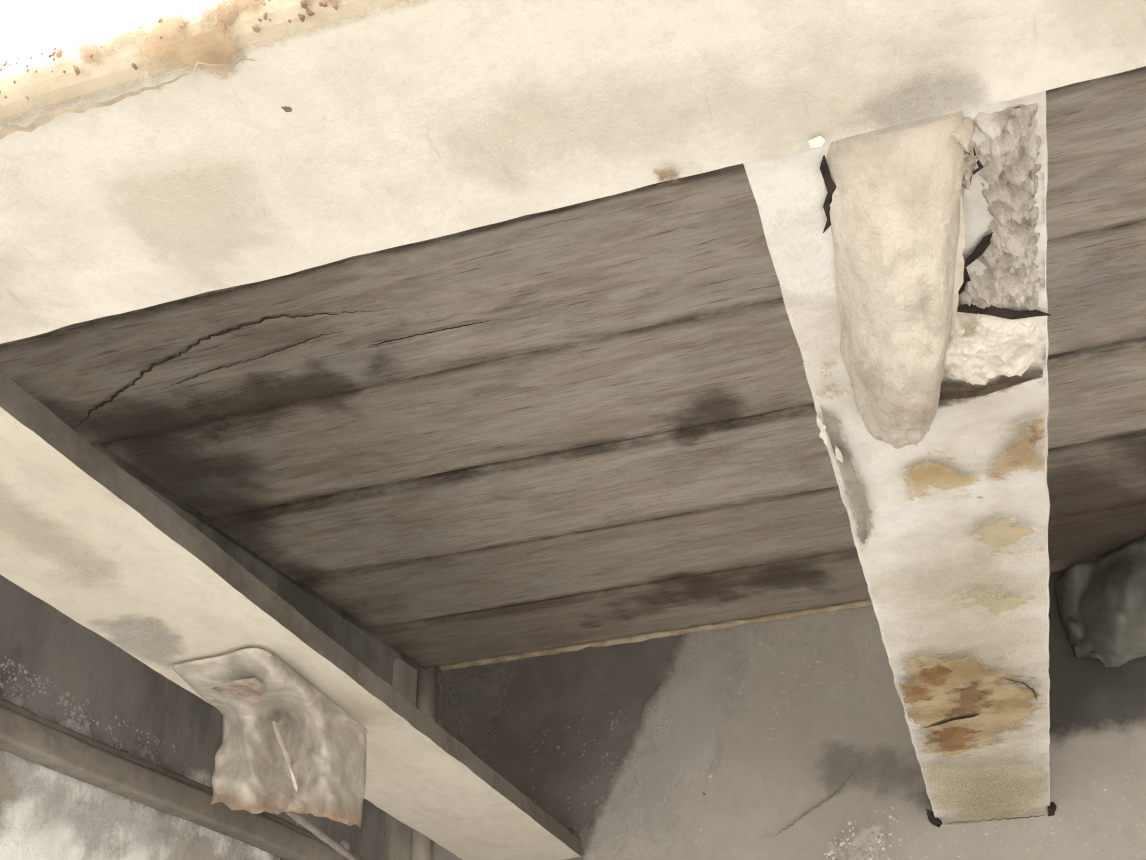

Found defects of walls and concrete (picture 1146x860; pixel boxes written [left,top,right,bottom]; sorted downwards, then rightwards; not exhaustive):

crack [820,155,836,233]
crack [970,147,984,183]
flaking render [938,103,1045,408]
crack [957,232,1051,320]
crack [73,308,500,430]
rust [904,419,1045,500]
rust [971,517,1035,554]
damp [0,574,223,788]
peeling [170,648,368,827]
rust [899,655,1042,757]
damp [274,798,386,860]